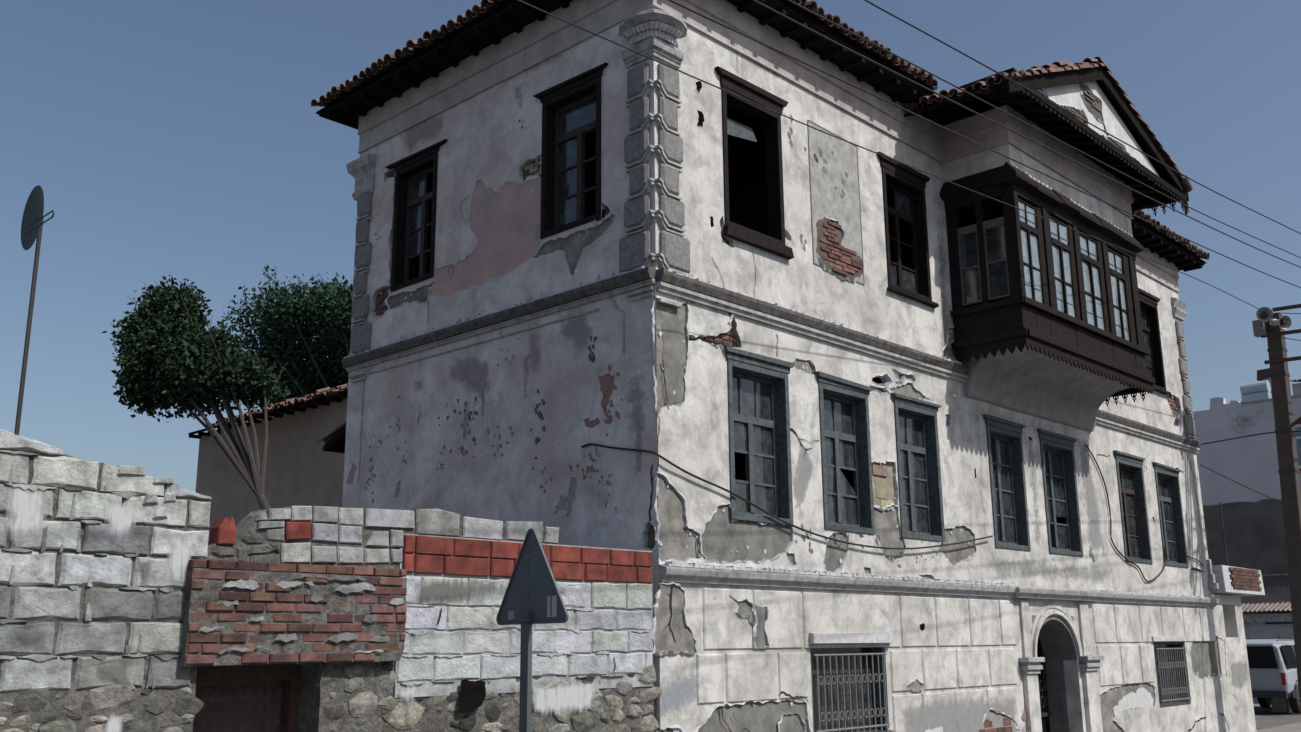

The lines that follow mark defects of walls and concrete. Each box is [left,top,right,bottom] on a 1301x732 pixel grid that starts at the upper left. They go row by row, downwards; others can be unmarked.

flaking render [370,154,616,319]
flaking render [785,217,863,284]
flaking render [651,296,740,416]
peeling [530,335,628,517]
flaking render [641,459,977,580]
flaking render [652,582,697,656]
flaking render [735,596,769,649]
flaking render [654,699,811,732]
flaking render [1100,682,1155,732]